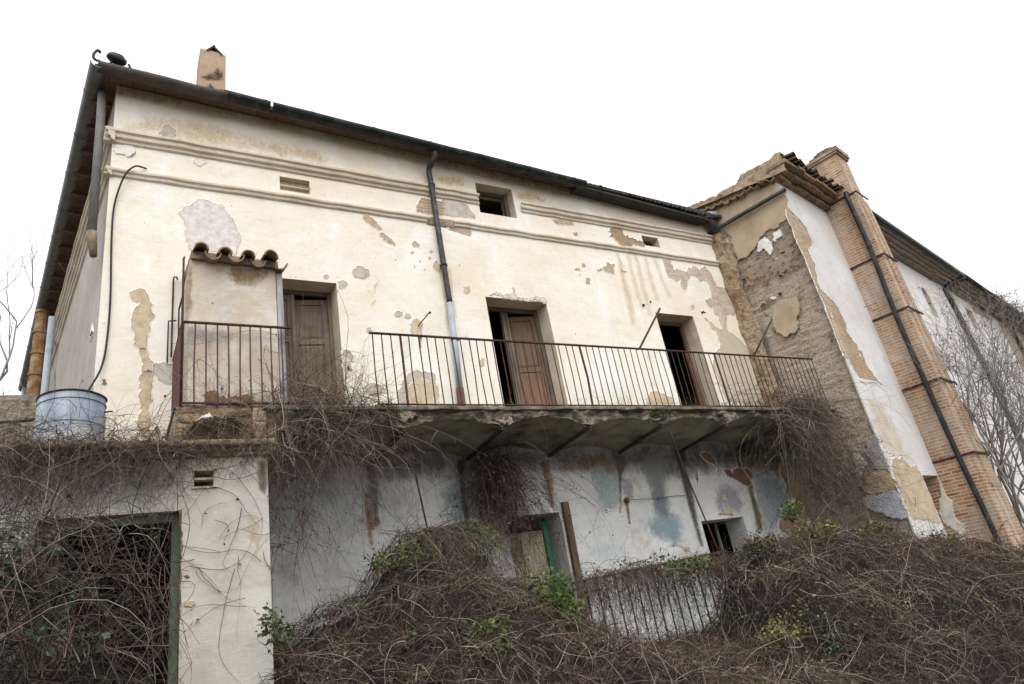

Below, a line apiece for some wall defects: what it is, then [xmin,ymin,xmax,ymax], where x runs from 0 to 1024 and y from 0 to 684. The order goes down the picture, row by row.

peeling [178,198,242,256]
peeling [415,197,476,236]
spalling [608,227,645,248]
peeling [323,265,370,290]
peeling [702,183,882,385]
peeling [128,287,173,439]
peeling [661,258,764,423]
peeling [363,369,440,424]
corrosion [361,495,380,543]
leakage [500,444,785,513]
peeling [699,451,753,487]
peeling [853,453,966,535]